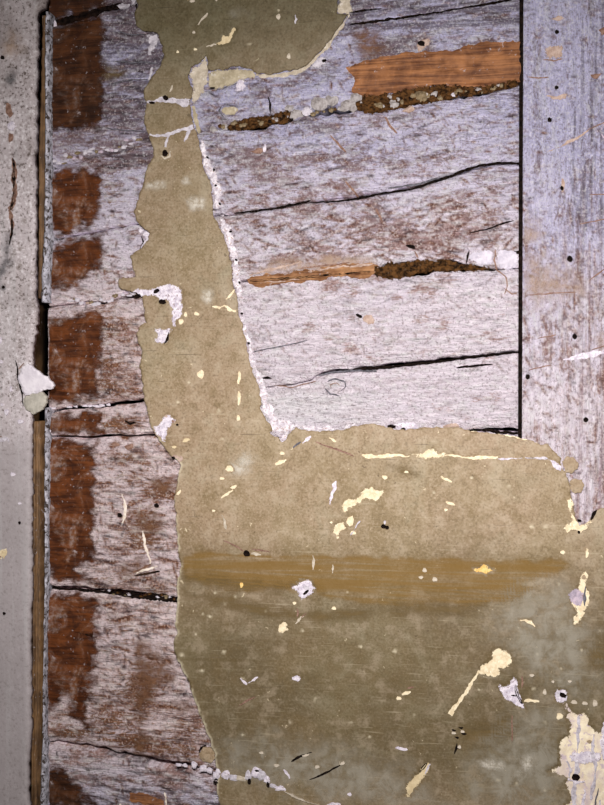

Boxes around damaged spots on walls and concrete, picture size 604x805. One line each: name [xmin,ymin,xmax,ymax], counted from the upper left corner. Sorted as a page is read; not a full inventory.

peeling [49,0,107,131]
crack [350,0,510,25]
peeling [51,166,104,290]
crack [234,162,519,214]
flaking render [133,284,199,344]
peeling [200,141,355,448]
crack [253,340,307,352]
crack [263,352,517,388]
peeling [10,310,134,582]
crack [51,586,177,602]
peeling [47,592,101,729]
flaking render [448,648,604,805]